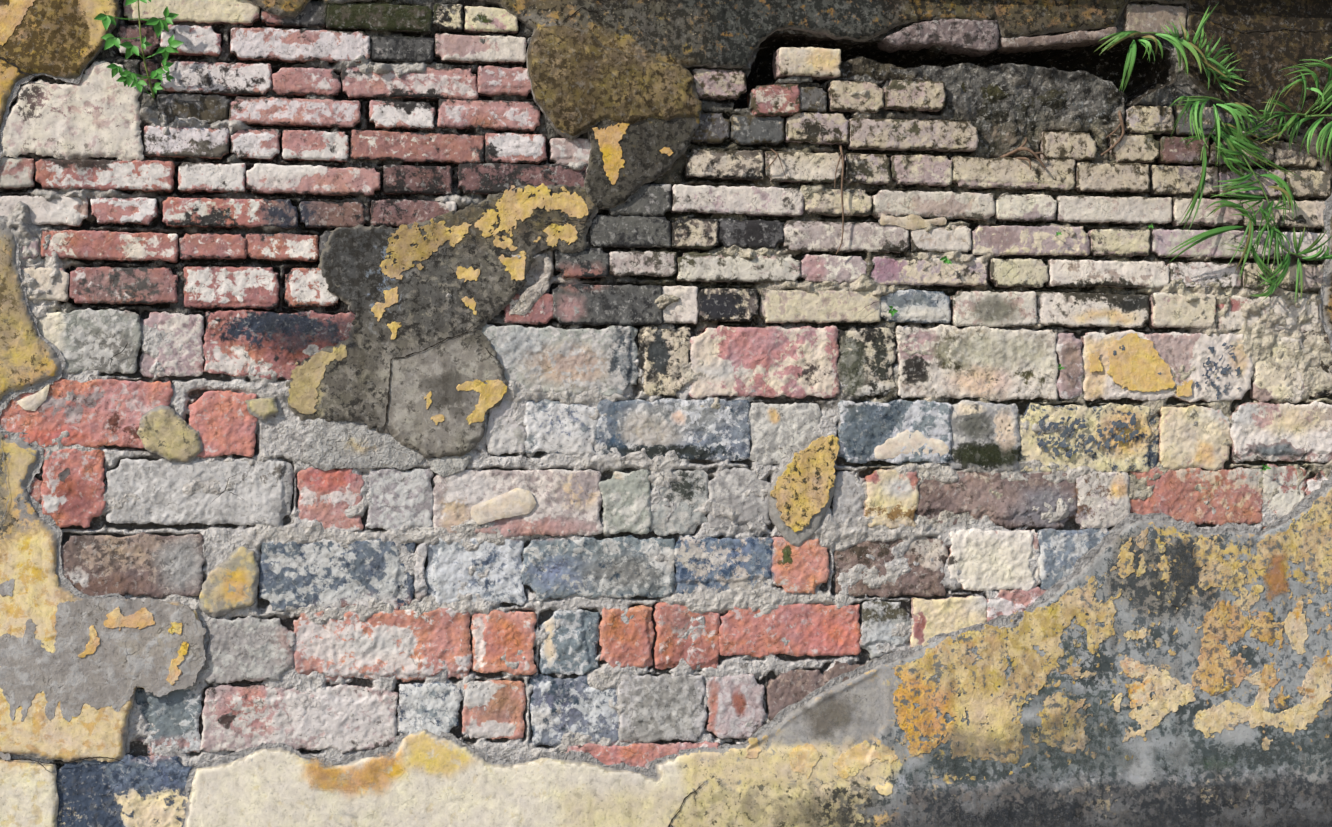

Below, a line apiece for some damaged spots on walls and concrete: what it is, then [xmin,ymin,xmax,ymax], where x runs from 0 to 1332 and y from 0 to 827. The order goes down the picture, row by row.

peeling [1095,88,1128,124]
peeling [592,123,629,185]
peeling [543,223,578,247]
peeling [456,266,480,282]
peeling [498,251,527,281]
peeling [371,287,399,322]
peeling [387,322,402,340]
peeling [1110,527,1179,586]
peeling [1248,490,1332,594]
peeling [1119,538,1332,742]
peeling [1032,692,1097,765]
crack [668,784,703,827]